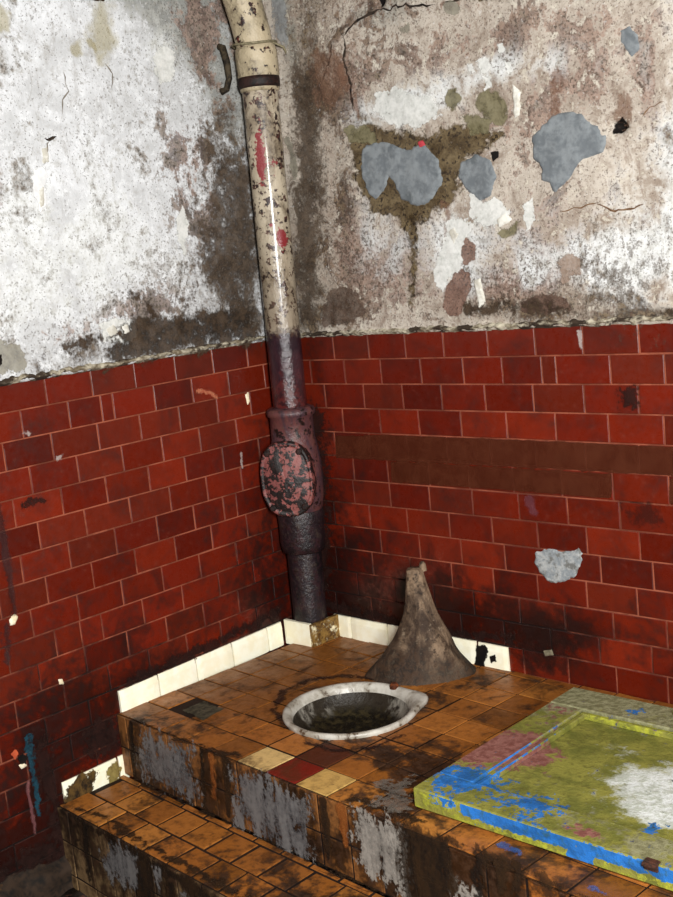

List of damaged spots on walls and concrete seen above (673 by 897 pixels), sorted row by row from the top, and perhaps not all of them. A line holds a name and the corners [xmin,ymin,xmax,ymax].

crack [319,0,459,112]
leakage [62,142,264,374]
leakage [284,65,328,329]
leakage [349,86,510,304]
leakage [523,198,535,231]
leakage [128,721,203,806]
leakage [222,755,330,862]
leakage [303,735,402,752]